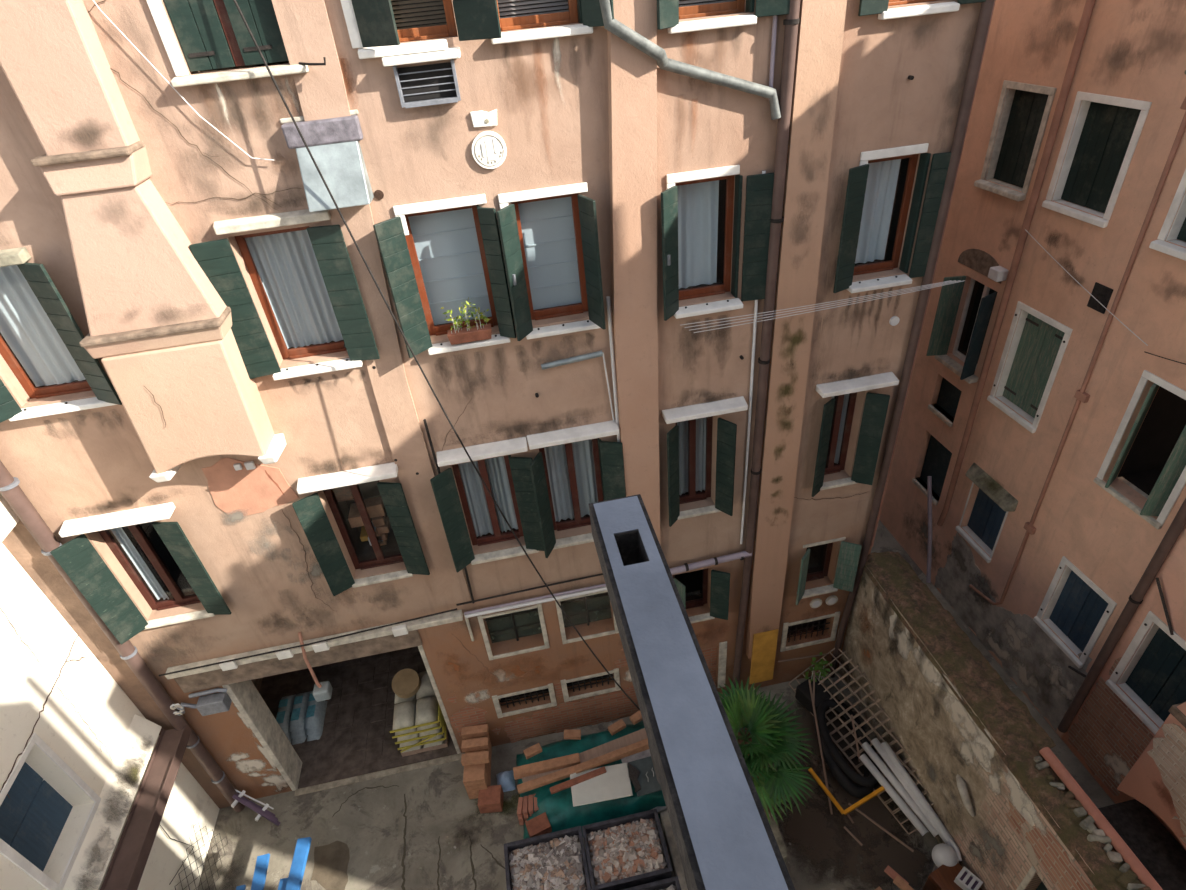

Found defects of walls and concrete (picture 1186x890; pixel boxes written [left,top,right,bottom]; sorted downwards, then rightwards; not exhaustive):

crack [110,68,300,211]
crack [0,608,110,798]
spalling [1068,657,1186,843]
crack [333,785,407,890]
crack [435,836,443,890]
crack [469,836,505,890]